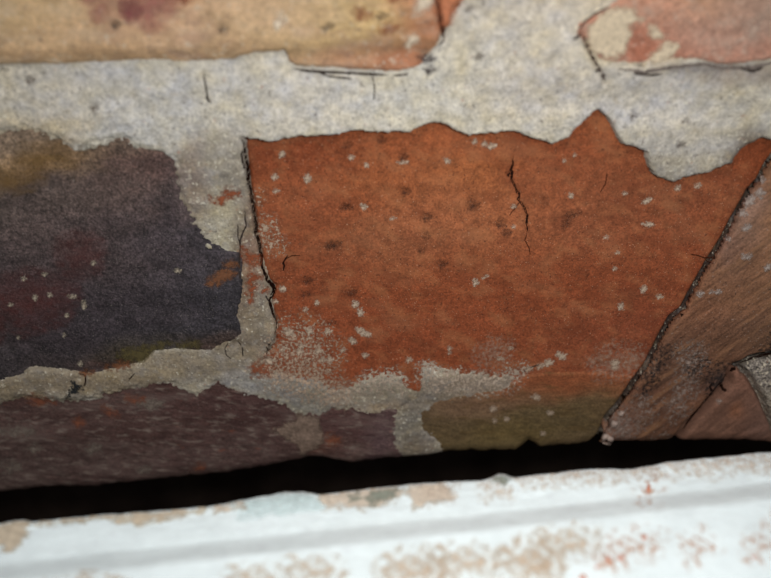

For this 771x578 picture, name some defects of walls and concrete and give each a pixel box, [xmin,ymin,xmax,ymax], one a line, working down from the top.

crack [573,6,771,84]
crack [237,139,300,354]
crack [507,158,531,255]
peeling [0,483,455,552]